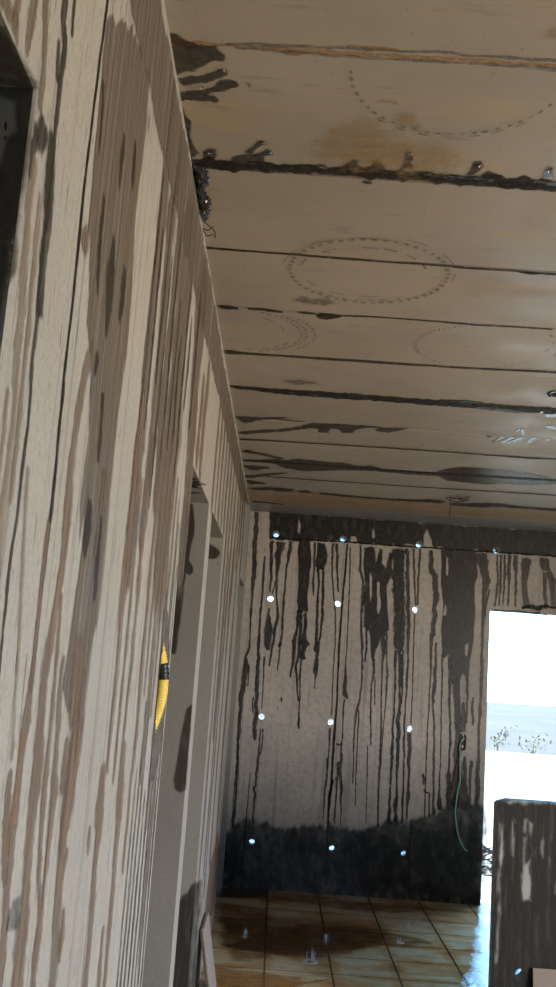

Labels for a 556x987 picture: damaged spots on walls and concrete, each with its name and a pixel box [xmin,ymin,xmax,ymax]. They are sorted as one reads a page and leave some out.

corrosion [170,33,556,68]
leakage [196,141,556,192]
leakage [238,423,408,435]
leakage [487,428,550,443]
leakage [241,450,556,485]
leakage [12,0,249,987]
leakage [222,512,556,905]